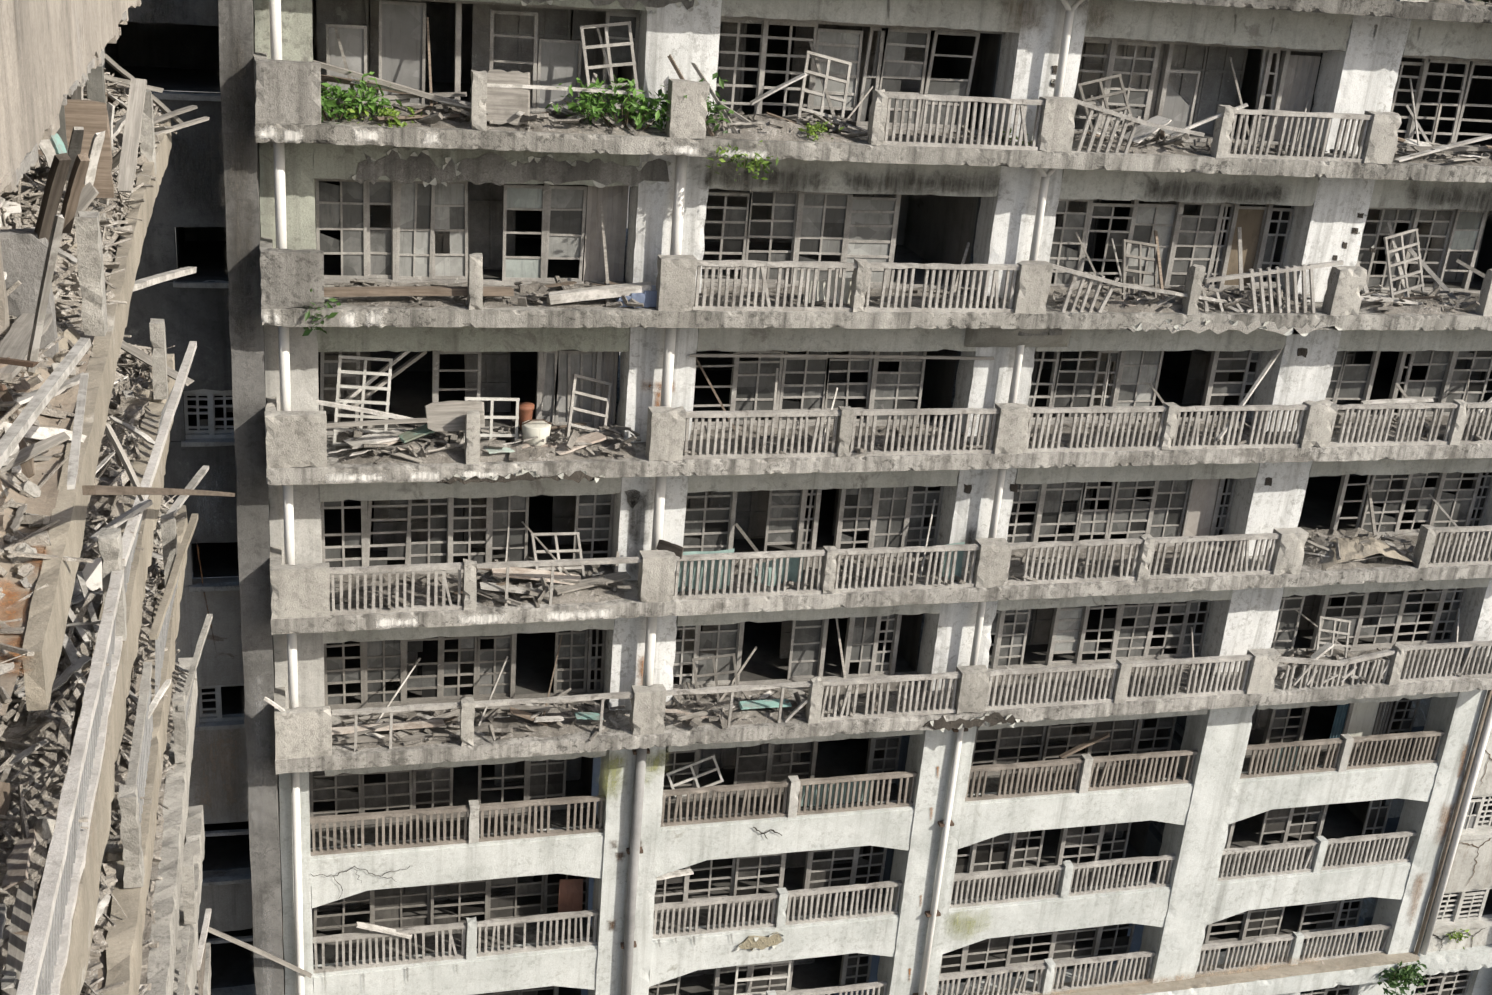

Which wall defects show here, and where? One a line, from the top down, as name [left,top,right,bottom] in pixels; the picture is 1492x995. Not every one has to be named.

spalling [923,712,1024,732]
crack [1458,838,1491,884]
crack [311,866,410,898]
peeling [737,932,784,951]